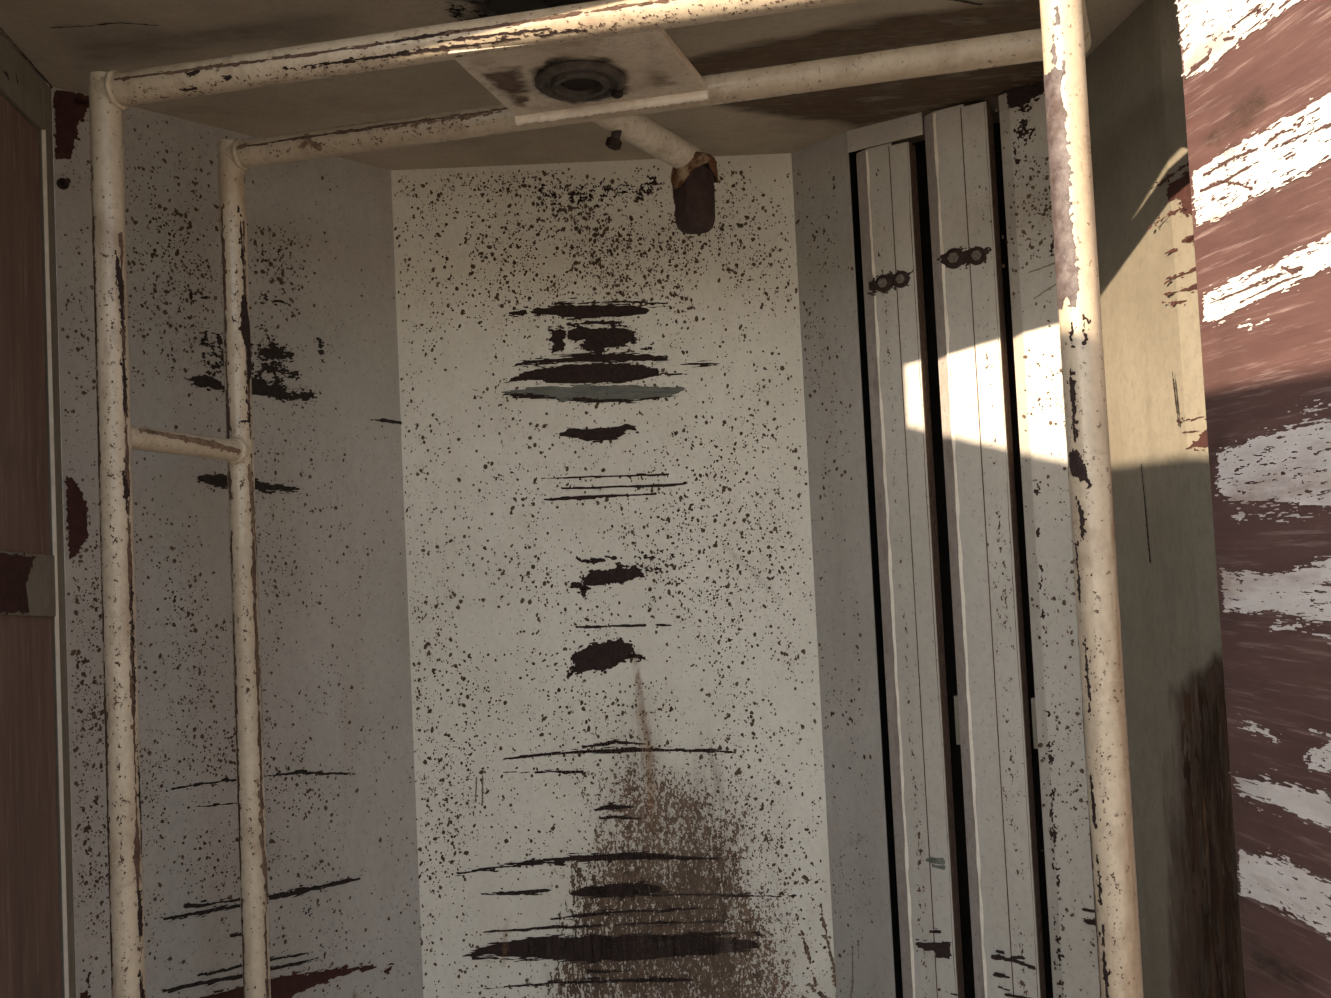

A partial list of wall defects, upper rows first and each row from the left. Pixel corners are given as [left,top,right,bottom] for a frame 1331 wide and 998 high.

peeling [1175,0,1305,87]
peeling [53,90,89,163]
peeling [1148,93,1331,245]
peeling [232,206,322,424]
peeling [548,316,654,357]
peeling [1201,233,1331,331]
peeling [1176,399,1331,524]
peeling [63,476,91,559]
corrosion [118,118,882,998]
peeling [568,549,675,597]
peeling [563,637,646,681]
peeling [266,961,394,998]